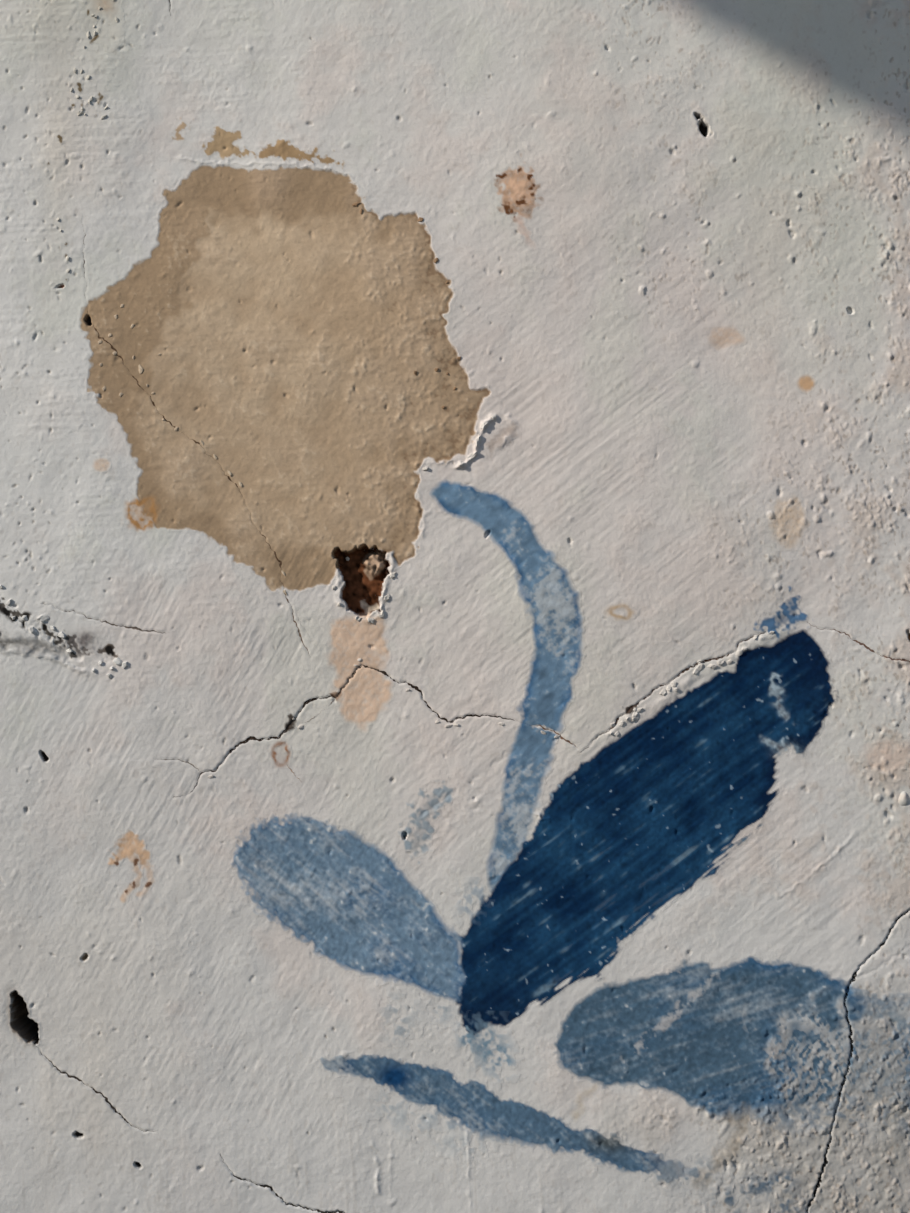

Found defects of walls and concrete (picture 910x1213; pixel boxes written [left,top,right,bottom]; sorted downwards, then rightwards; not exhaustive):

peeling [79,116,522,624]
crack [809,623,910,662]
crack [163,631,775,797]
spalling [3,981,41,1051]
crack [37,1047,152,1132]
crack [806,910,910,1212]
crack [220,1155,345,1213]